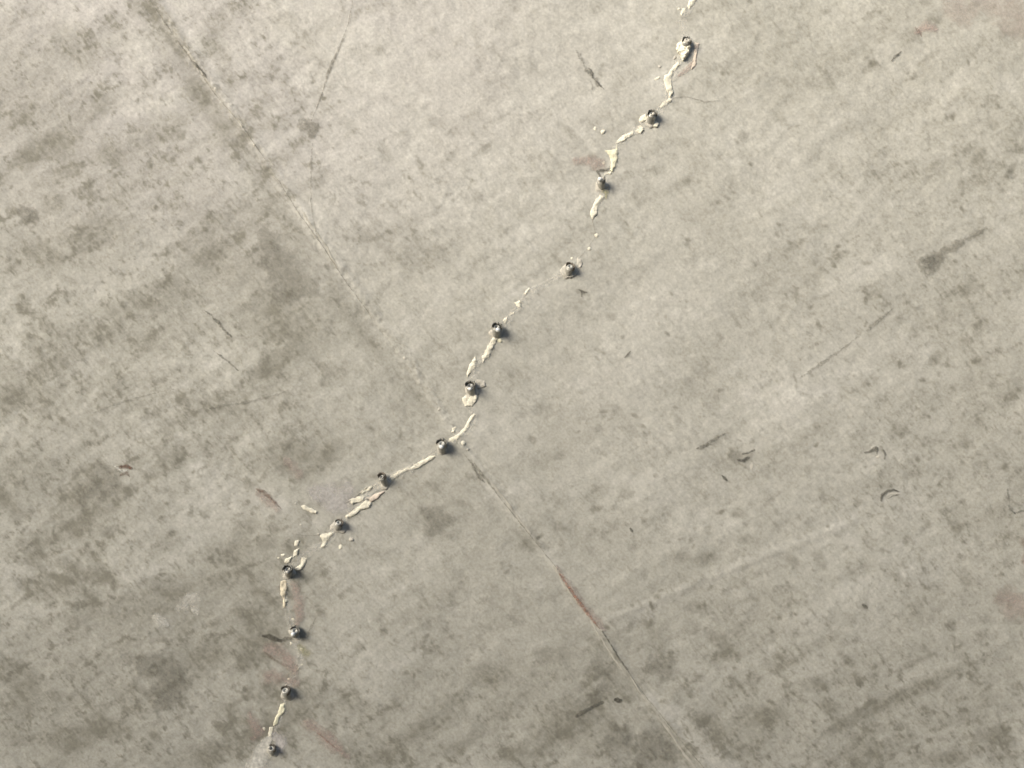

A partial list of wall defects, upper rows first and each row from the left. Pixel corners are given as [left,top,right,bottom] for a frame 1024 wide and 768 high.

crack [183,46,257,147]
crack [553,566,696,768]